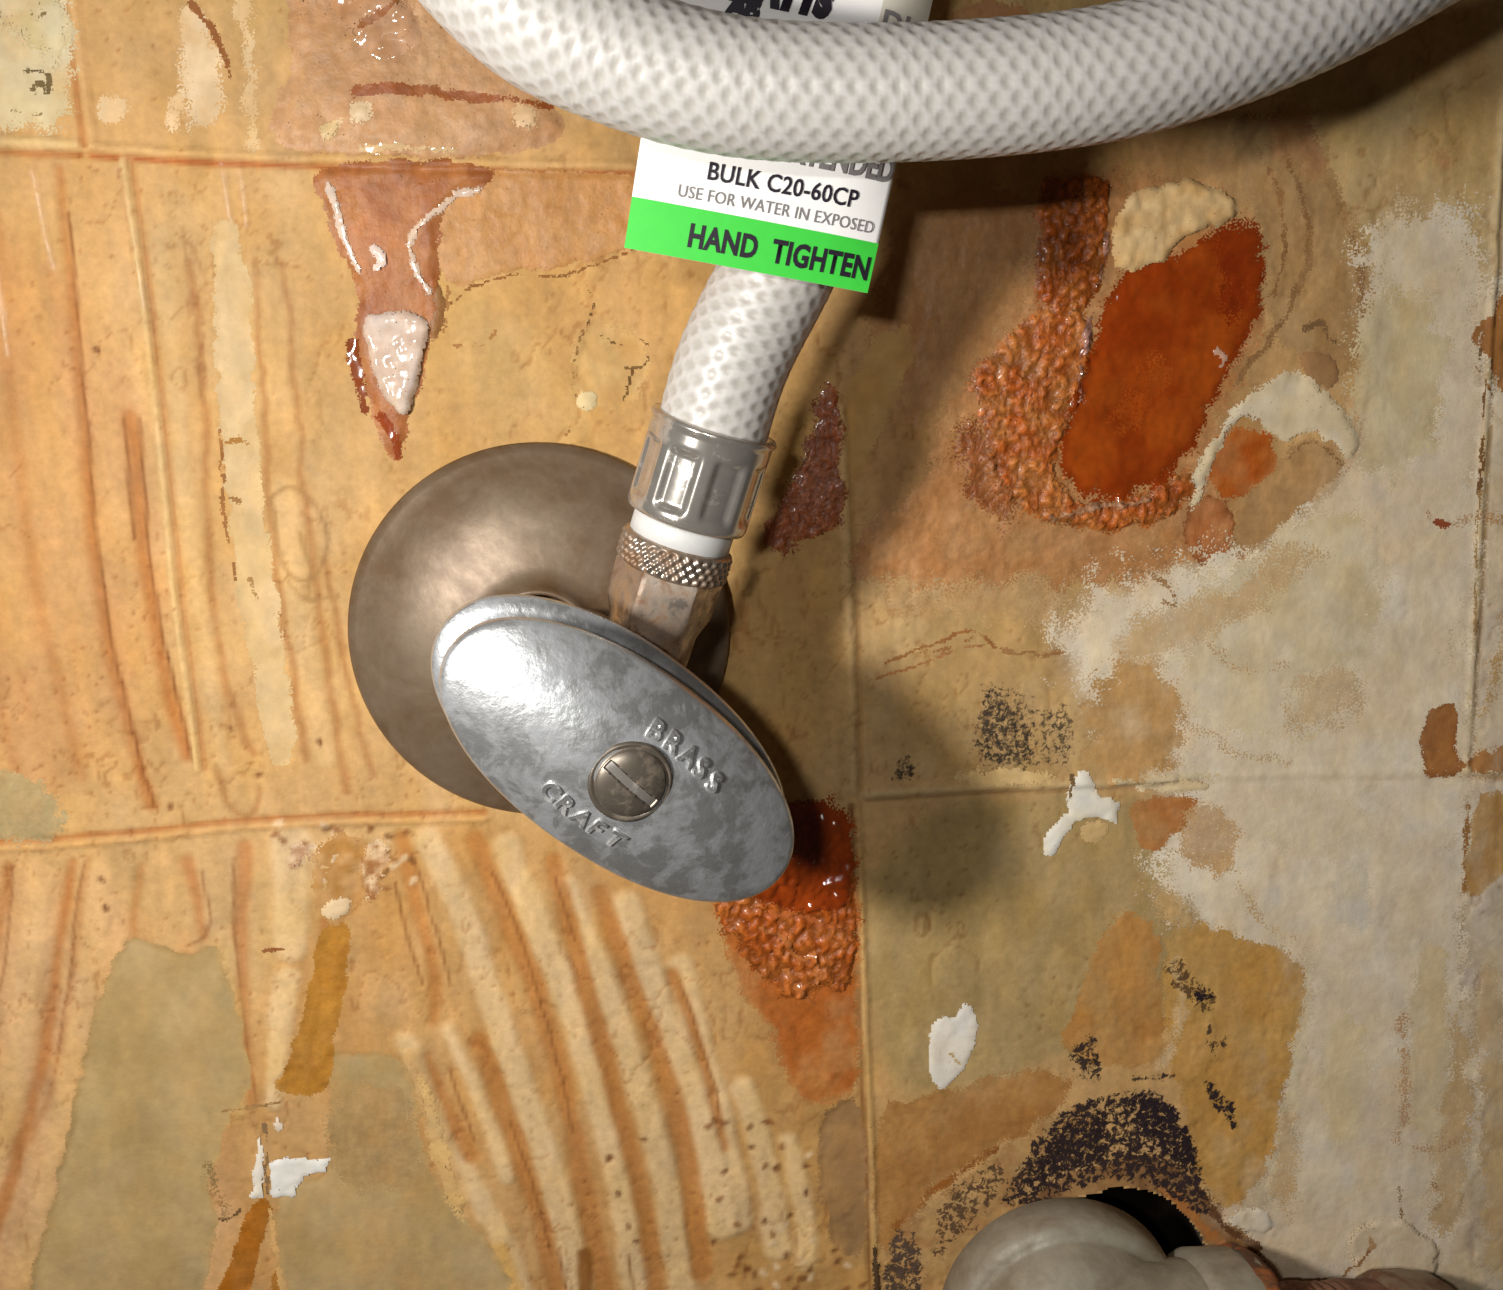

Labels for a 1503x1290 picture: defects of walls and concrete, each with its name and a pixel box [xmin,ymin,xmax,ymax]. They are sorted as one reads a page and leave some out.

corrosion [762,149,1278,613]
peeling [0,768,72,850]
corrosion [707,793,867,1108]
mould [891,755,915,780]
mould [972,684,1073,770]
leakage [868,880,1309,1290]
peeling [864,178,1503,1281]